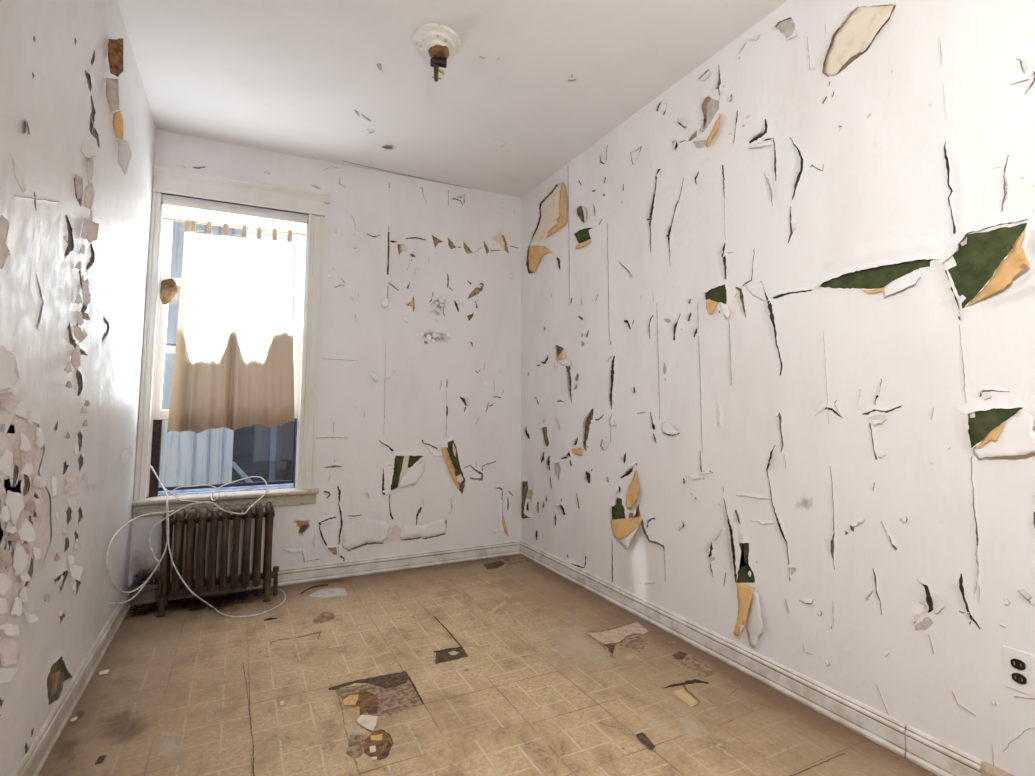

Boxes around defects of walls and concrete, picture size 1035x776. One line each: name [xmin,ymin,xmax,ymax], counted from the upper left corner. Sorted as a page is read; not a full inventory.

peeling [106,38,132,175]
spalling [811,0,907,104]
crack [644,35,1028,452]
peeling [820,261,930,297]
peeling [943,223,1030,309]
peeling [0,174,111,762]
crack [366,164,662,582]
peeling [733,530,763,647]
crack [701,408,800,587]
crack [824,466,843,570]
crack [821,330,903,492]
crack [949,456,986,630]